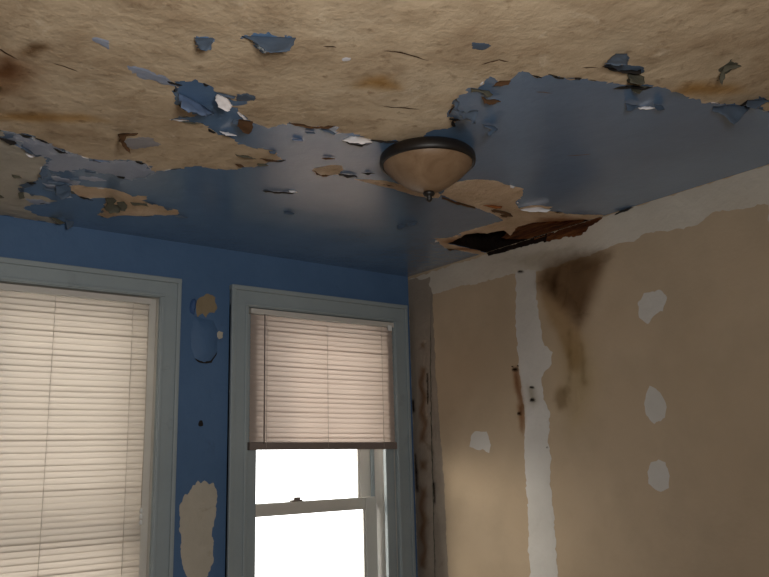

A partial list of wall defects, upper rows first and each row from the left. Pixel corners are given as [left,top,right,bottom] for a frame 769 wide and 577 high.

peeling [0,0,769,229]
peeling [312,158,604,254]
peeling [189,294,217,317]
peeling [179,480,217,577]